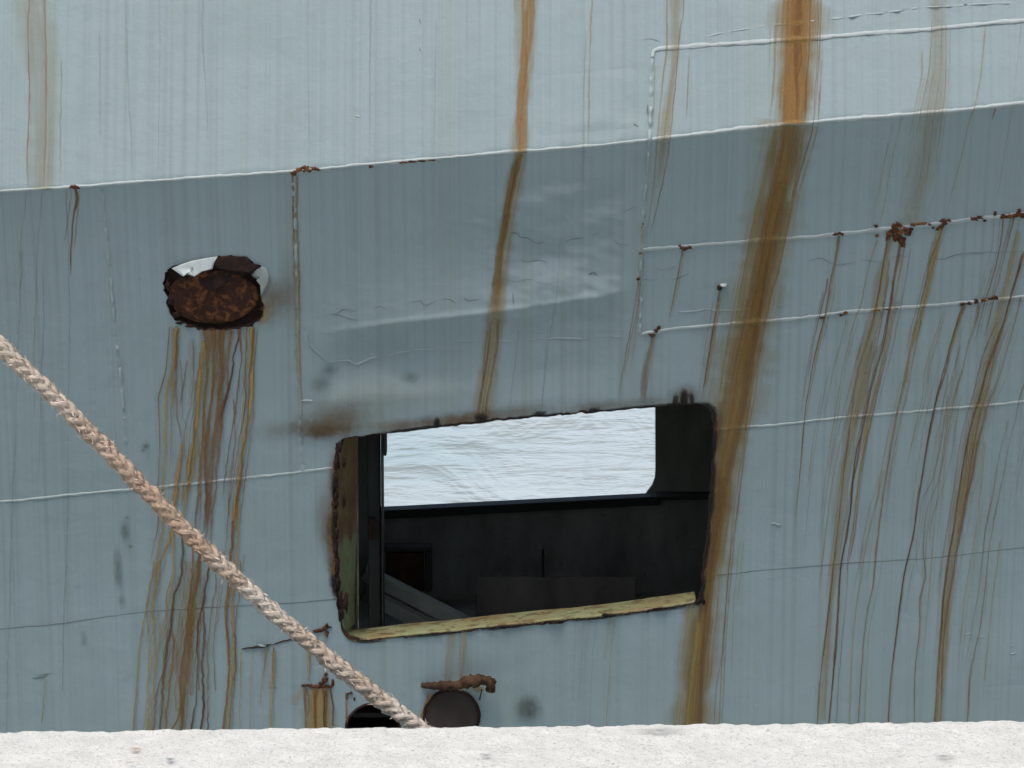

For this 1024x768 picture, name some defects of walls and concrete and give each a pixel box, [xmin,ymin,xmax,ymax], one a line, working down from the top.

rust [157,318,262,573]
rust [290,165,321,398]
rust [478,0,533,416]
rust [684,0,819,725]
rust [798,232,844,490]
rust [817,158,951,724]
rust [888,209,1024,722]
rust [133,516,251,730]
rust [260,647,275,728]
rust [301,652,355,729]